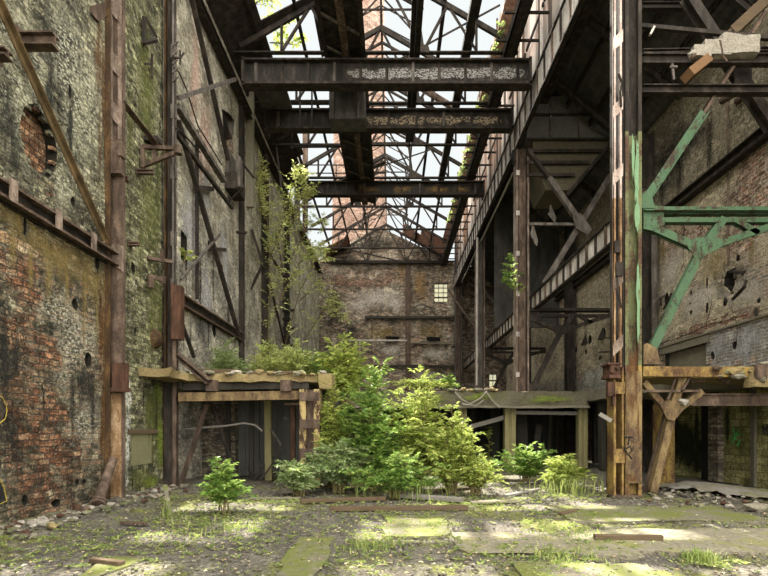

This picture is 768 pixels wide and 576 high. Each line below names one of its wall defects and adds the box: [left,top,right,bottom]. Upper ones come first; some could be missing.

spalling [0,23,97,205]
peeling [632,134,640,233]
spalling [730,145,768,206]
spalling [0,230,97,516]
damp [71,366,95,426]
peeling [679,275,768,388]